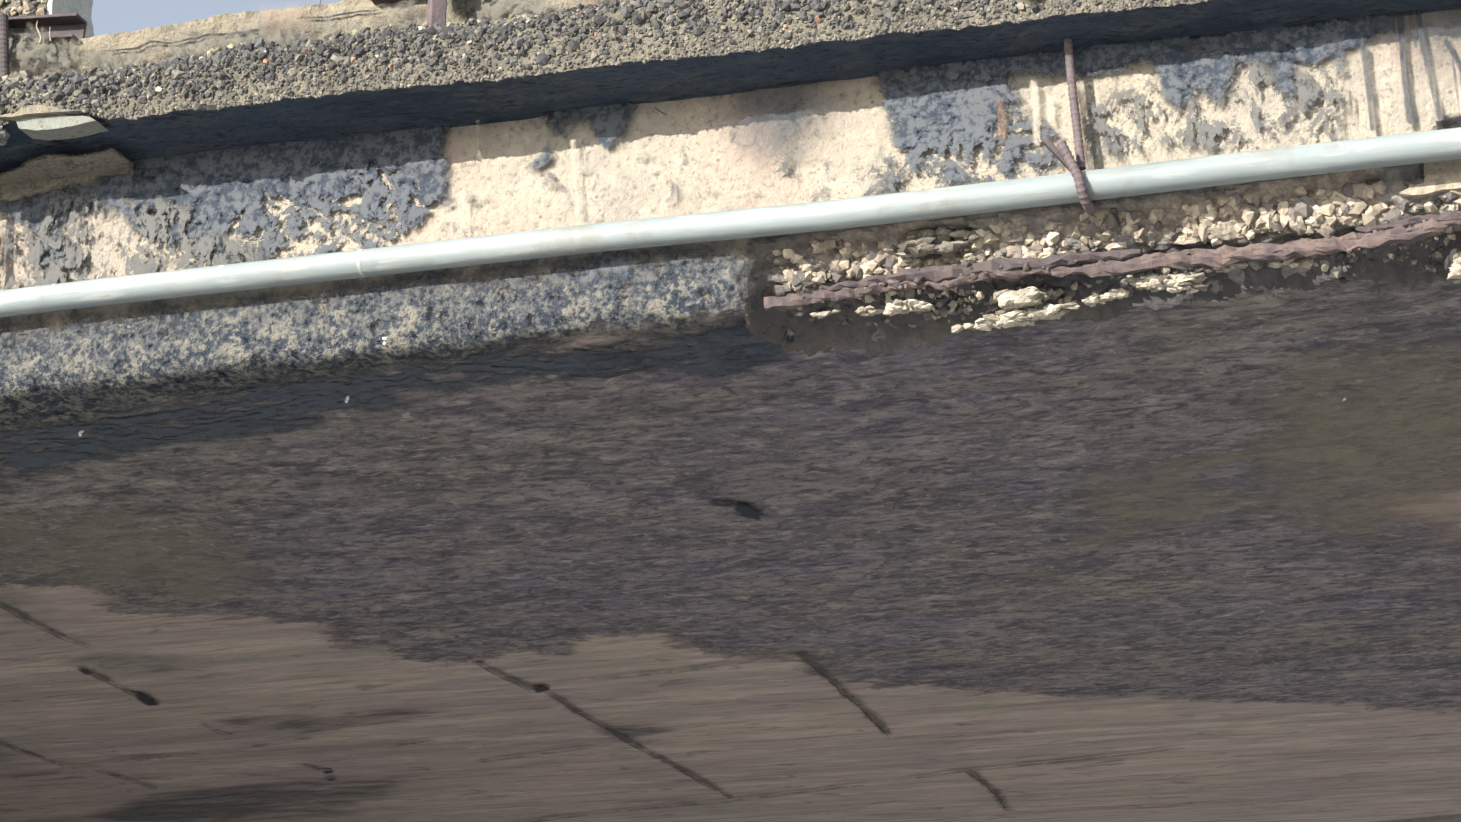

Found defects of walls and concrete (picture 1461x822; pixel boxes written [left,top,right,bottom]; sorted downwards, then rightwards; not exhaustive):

spalling [1433,116,1461,130]
water stain [0,246,795,477]
peeling [0,159,1461,711]
water stain [1244,353,1461,526]
crack [1,606,158,707]
crack [0,725,322,789]
crack [479,663,856,822]
crack [794,653,890,737]
crack [919,749,1175,812]